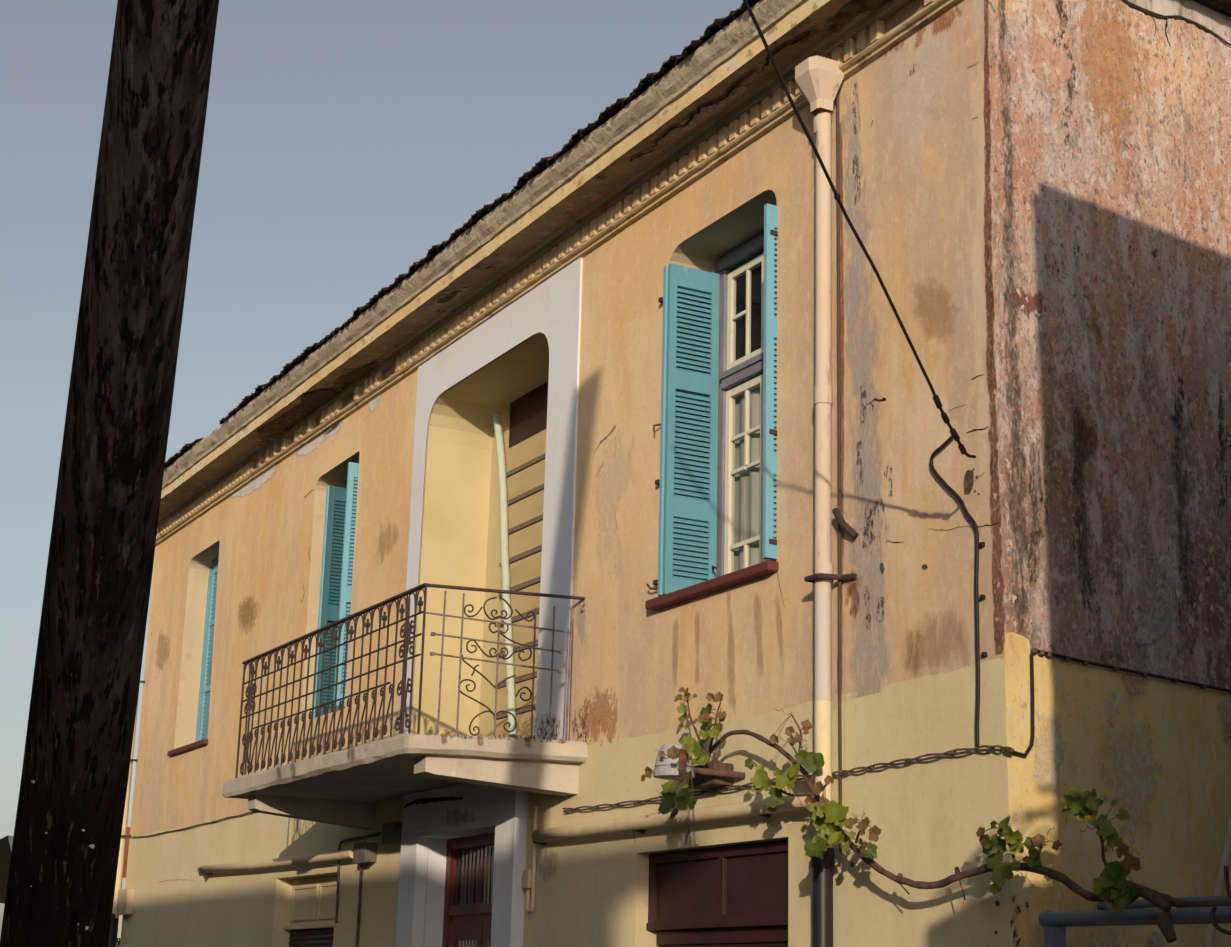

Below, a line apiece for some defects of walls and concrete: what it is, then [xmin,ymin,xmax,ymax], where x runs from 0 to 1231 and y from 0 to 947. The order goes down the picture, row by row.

damp [999,0,1010,83]
damp [1053,0,1077,149]
crack [1124,0,1231,47]
damp [1003,104,1049,630]
peeling [232,465,276,498]
peeling [296,420,342,456]
crack [594,423,617,476]
damp [1069,407,1098,612]
damp [1165,378,1195,654]
damp [1216,382,1231,518]
peeling [579,689,617,746]
crack [404,796,463,808]